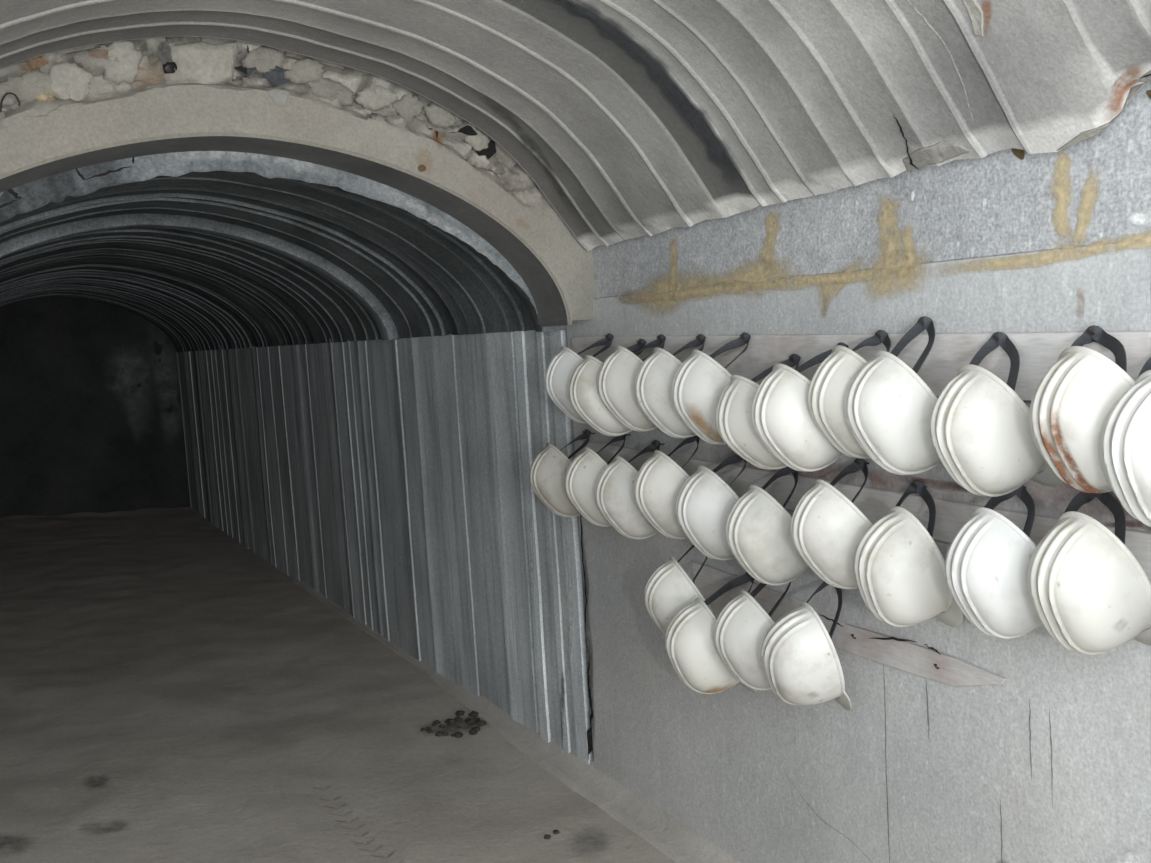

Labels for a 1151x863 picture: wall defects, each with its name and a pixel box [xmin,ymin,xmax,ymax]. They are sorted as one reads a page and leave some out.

spalling [0,40,144,130]
spalling [160,41,496,159]
water stain [1130,213,1151,225]
crack [869,637,941,863]
crack [1029,699,1053,808]
crack [997,801,1005,862]